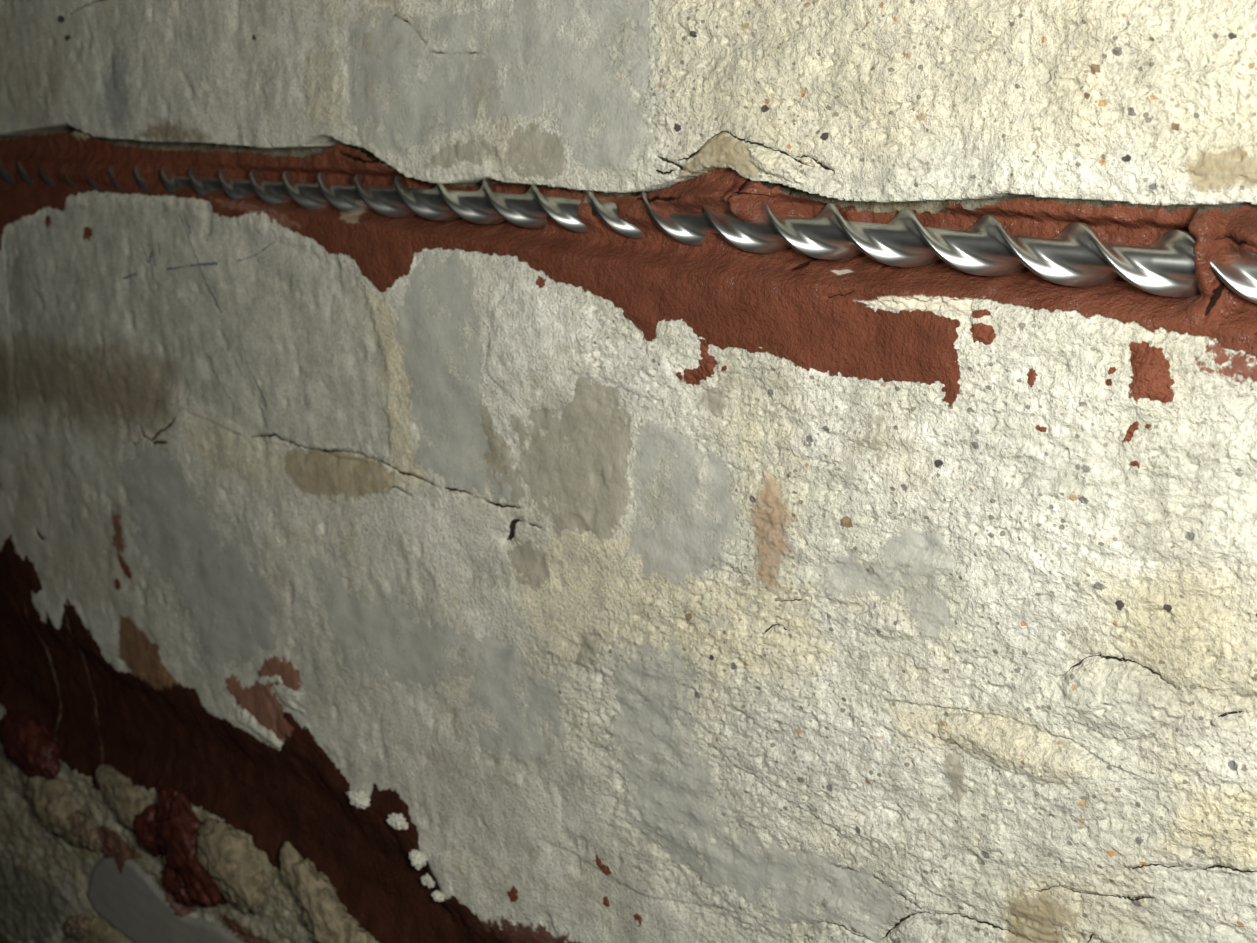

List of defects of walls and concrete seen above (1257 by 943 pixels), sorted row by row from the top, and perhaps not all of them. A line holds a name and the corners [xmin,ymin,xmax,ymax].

crack [339,152,387,164]
crack [637,130,834,207]
peeling [747,145,806,184]
peeling [485,281,682,410]
crack [252,434,541,540]
peeling [257,674,307,715]
peeling [235,708,282,751]